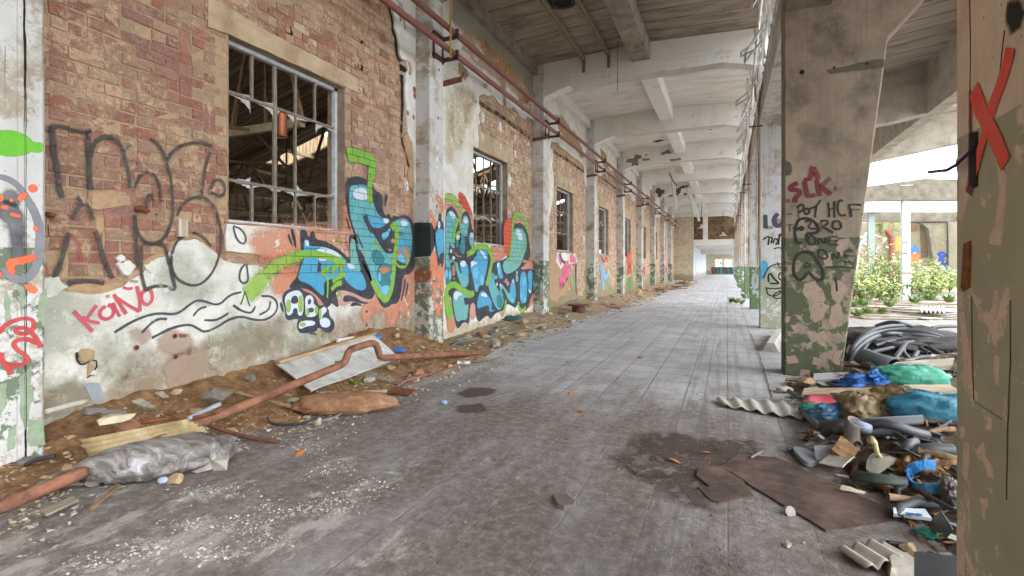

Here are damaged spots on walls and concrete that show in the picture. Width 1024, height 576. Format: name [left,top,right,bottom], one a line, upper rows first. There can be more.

crack [387,1,409,168]
peeling [955,150,1007,260]
peeling [823,239,850,266]
peeling [75,348,98,378]
peeling [131,330,219,388]
peeling [786,350,844,376]
peeling [785,280,848,343]
peeling [957,291,972,385]
damp [613,434,756,508]
peeling [959,426,995,521]